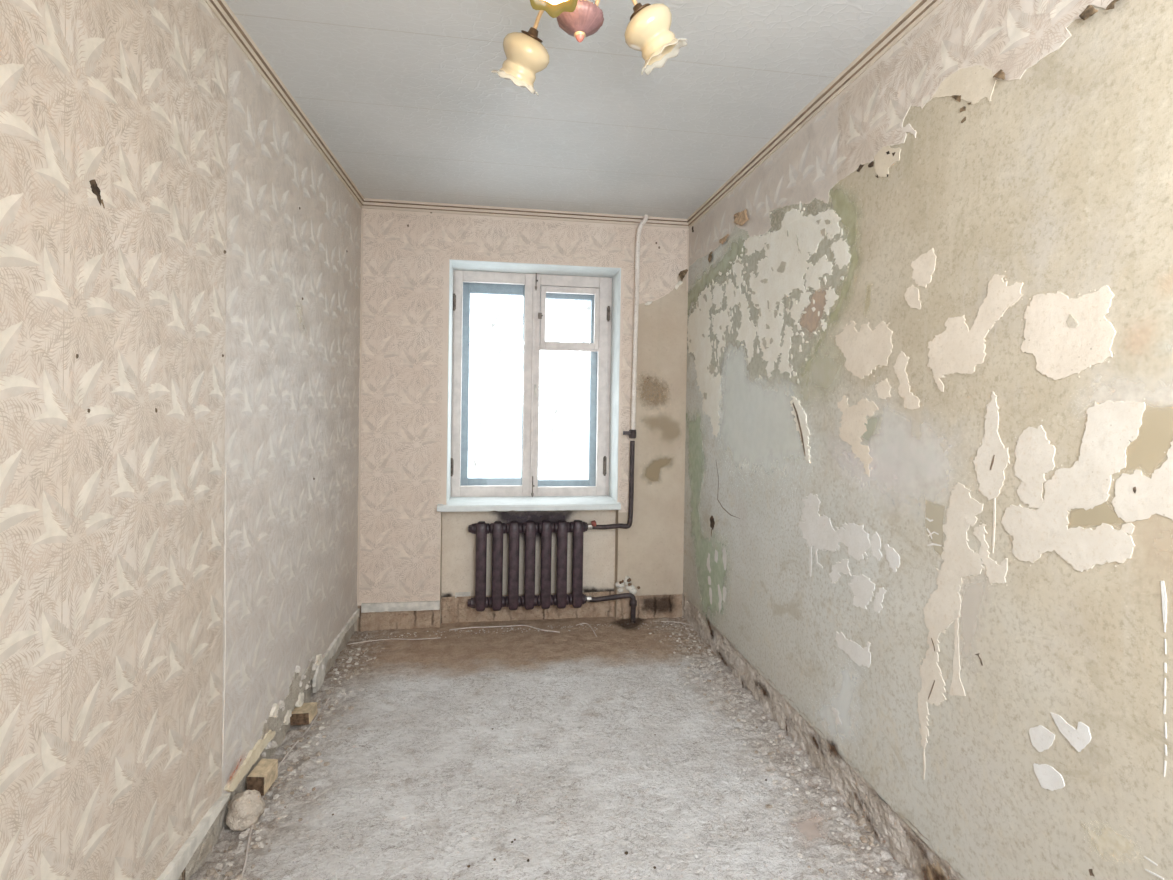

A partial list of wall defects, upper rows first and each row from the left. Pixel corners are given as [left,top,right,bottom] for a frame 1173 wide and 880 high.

peeling [687,200,920,477]
peeling [904,248,937,309]
peeling [927,271,1116,392]
peeling [798,493,900,613]
peeling [917,391,1173,779]
flaking render [178,576,966,880]